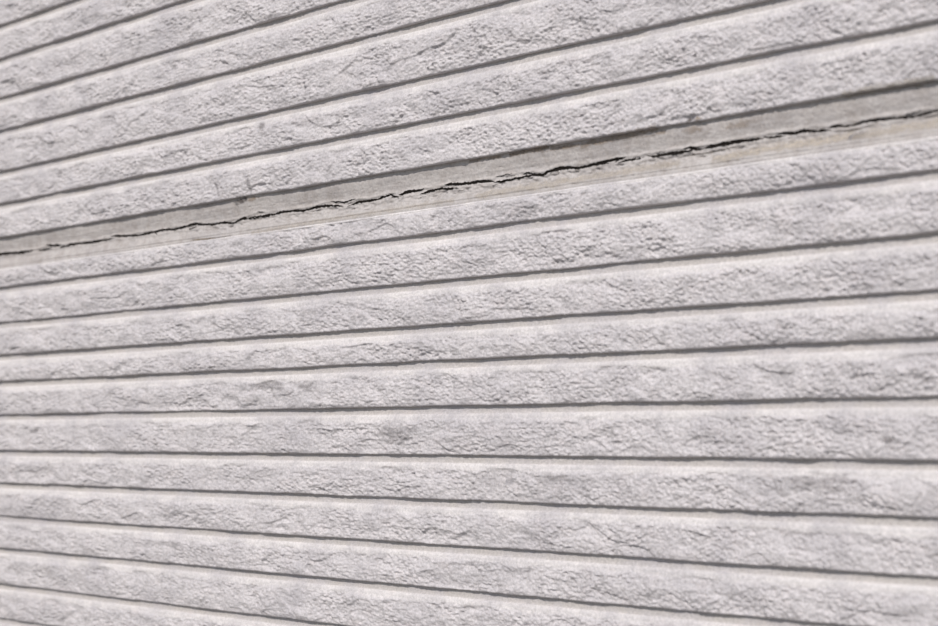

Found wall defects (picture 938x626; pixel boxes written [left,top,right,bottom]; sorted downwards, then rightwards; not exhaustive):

crack [0,109,938,256]